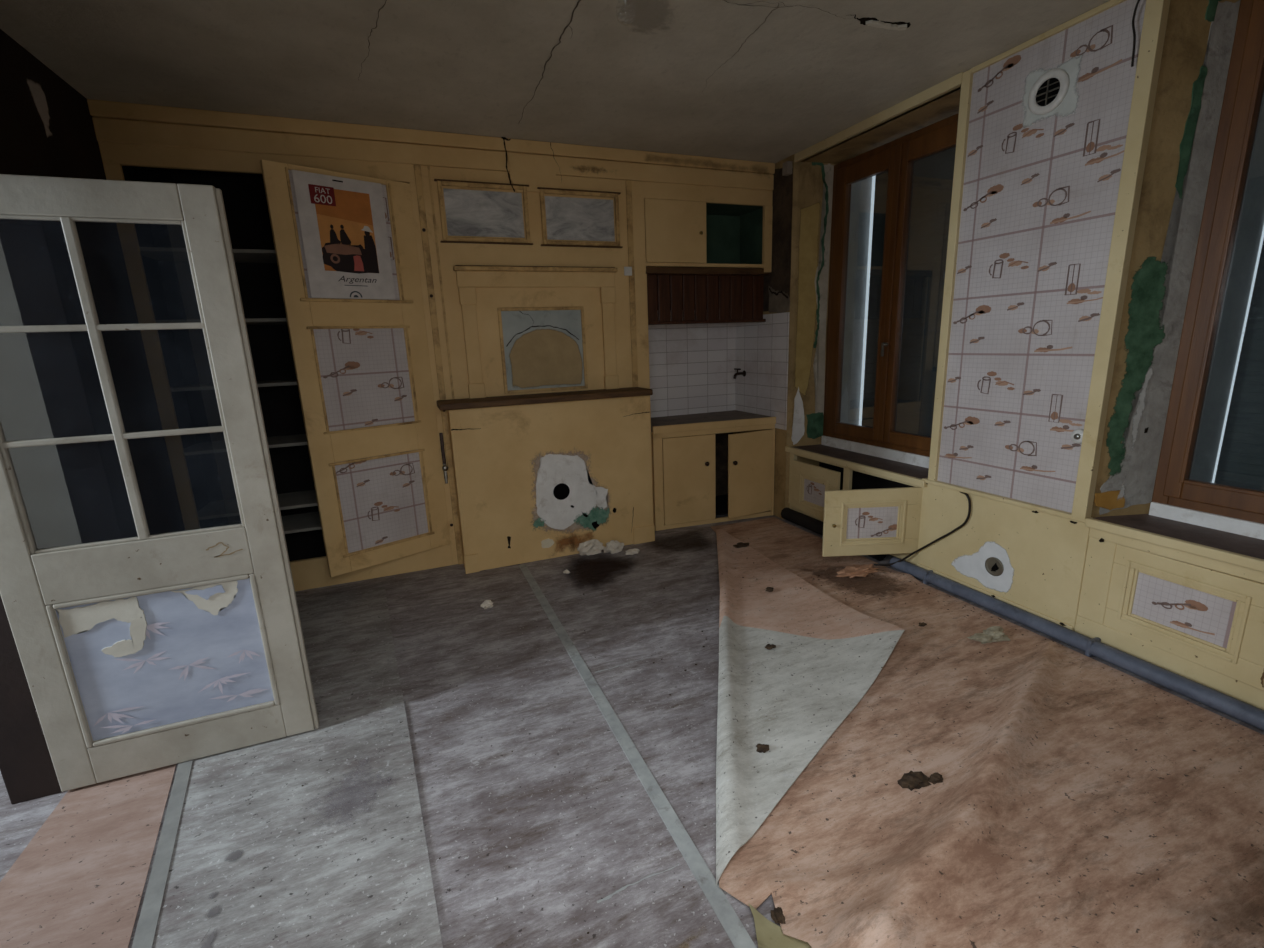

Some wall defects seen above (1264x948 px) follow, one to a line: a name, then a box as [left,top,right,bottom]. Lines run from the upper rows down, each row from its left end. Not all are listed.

flaking render [854,14,911,31]
crack [501,0,581,192]
peeling [1094,0,1240,515]
peeling [532,451,617,548]
leakage [567,556,632,585]